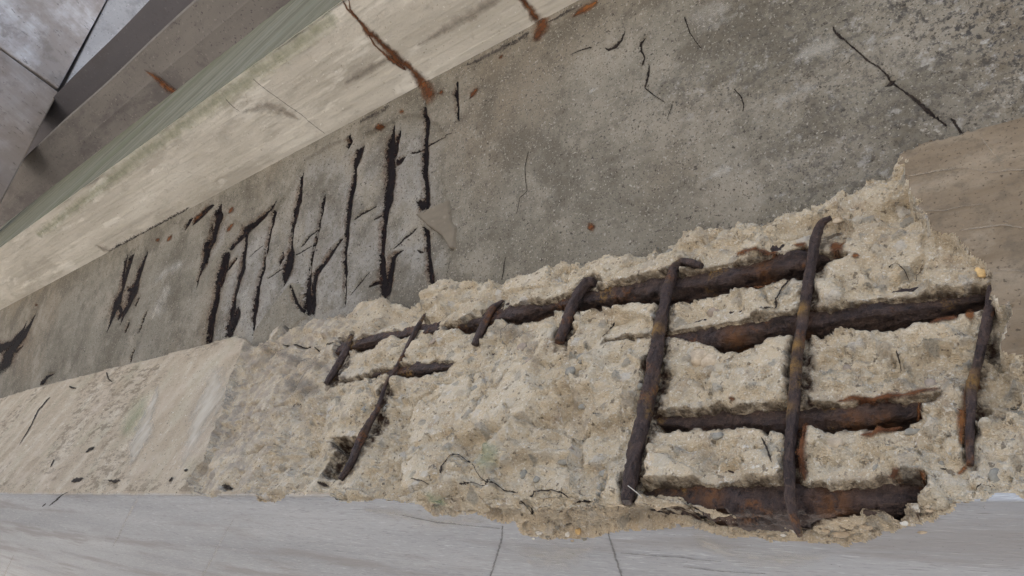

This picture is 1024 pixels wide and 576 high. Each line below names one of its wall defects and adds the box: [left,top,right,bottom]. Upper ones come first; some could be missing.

rust [342,0,443,100]
rust [521,0,548,41]
crack [572,32,672,119]
crack [833,27,963,134]
crack [185,79,460,344]
crack [0,315,36,373]
crack [107,250,148,362]
spalling [187,113,1024,547]
crack [411,453,591,515]
rust [796,423,808,481]
rust [837,387,939,422]
rust [957,387,966,442]